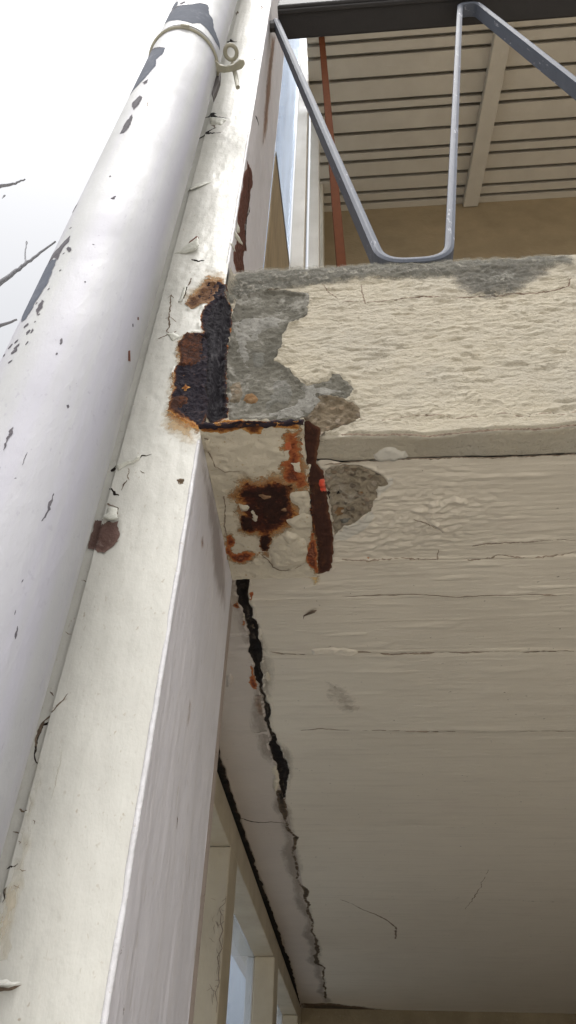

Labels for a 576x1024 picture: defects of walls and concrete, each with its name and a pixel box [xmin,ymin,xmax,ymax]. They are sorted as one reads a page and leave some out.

spalling [226,290,360,437]
rust [165,275,334,583]
peeling [88,488,120,553]
spalling [325,447,408,541]
crack [357,649,556,657]
crack [364,727,454,735]
crack [233,579,327,998]